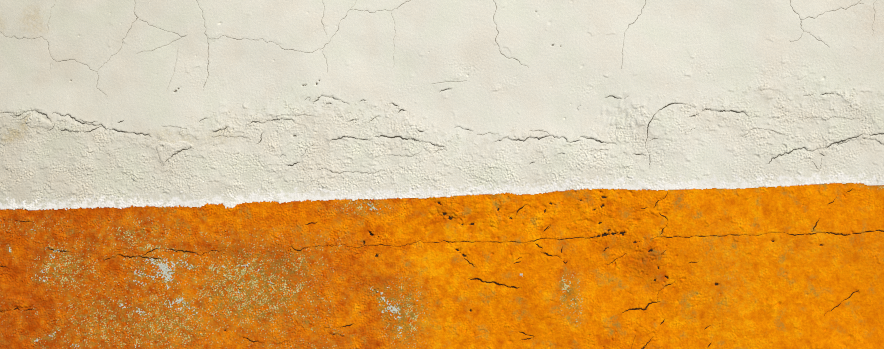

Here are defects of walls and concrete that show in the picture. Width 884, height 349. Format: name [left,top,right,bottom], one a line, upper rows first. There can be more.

crack [1,0,407,91]
crack [790,0,876,45]
crack [0,95,446,173]
crack [459,126,607,154]
crack [634,103,778,165]
crack [768,116,884,171]
crack [642,188,884,253]
crack [103,248,225,261]
crack [289,225,625,288]
crack [622,284,671,349]